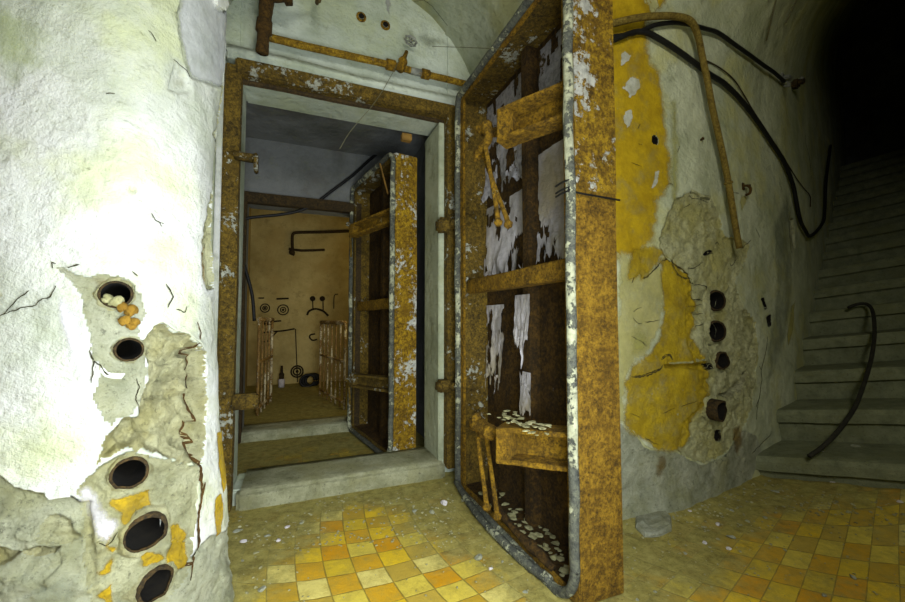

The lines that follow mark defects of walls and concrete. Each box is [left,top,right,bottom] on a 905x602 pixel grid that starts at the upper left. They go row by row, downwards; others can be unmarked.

crack [0,262,79,316]
peeling [0,267,235,602]
crack [166,284,206,581]
peeling [180,0,232,150]
flaking render [201,181,215,290]
rust [613,0,677,256]
flaking render [620,189,771,520]